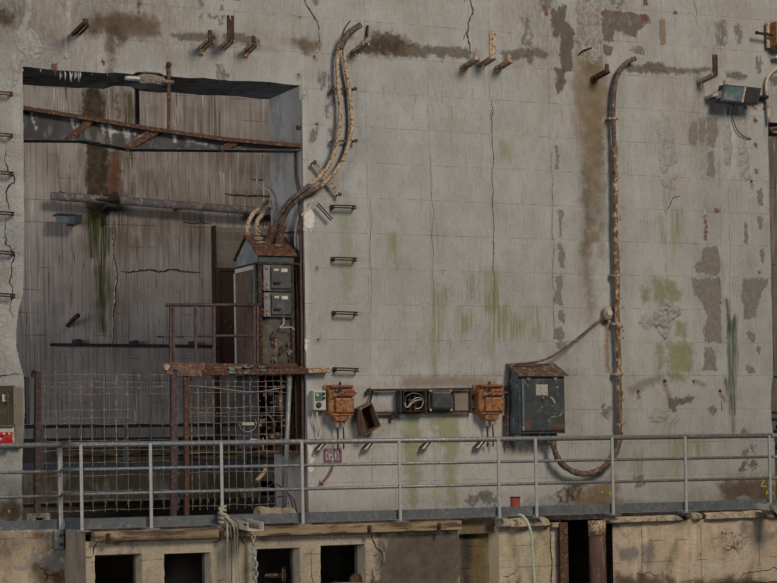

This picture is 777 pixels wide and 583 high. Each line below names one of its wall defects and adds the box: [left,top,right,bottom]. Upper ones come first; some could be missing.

crack [304,0,320,51]
damp [356,31,471,59]
crack [463,0,474,53]
peeling [601,0,666,57]
crack [3,148,15,318]
crack [111,217,201,365]
crack [488,100,496,310]
peeling [691,246,722,372]